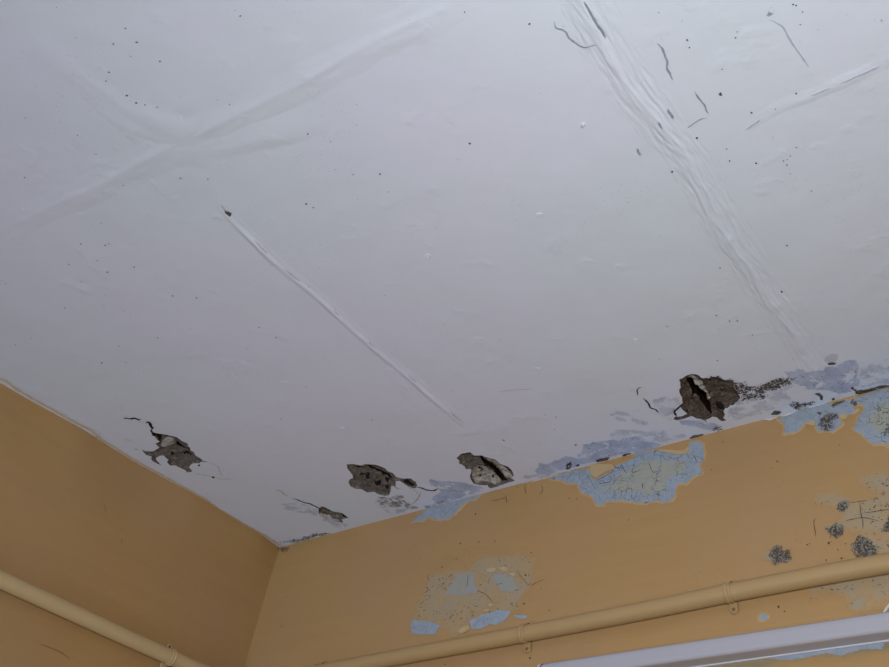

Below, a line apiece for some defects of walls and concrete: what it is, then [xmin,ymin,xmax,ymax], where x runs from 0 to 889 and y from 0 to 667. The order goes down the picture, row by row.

spalling [124,417,221,479]
spalling [278,490,348,523]
spalling [347,452,518,523]
peeling [548,439,712,507]
spalling [636,374,740,421]
damp [760,544,792,564]
peeling [775,385,889,449]
damp [825,522,845,539]
peeling [811,468,889,559]
damp [850,535,879,558]
peeling [408,552,544,640]